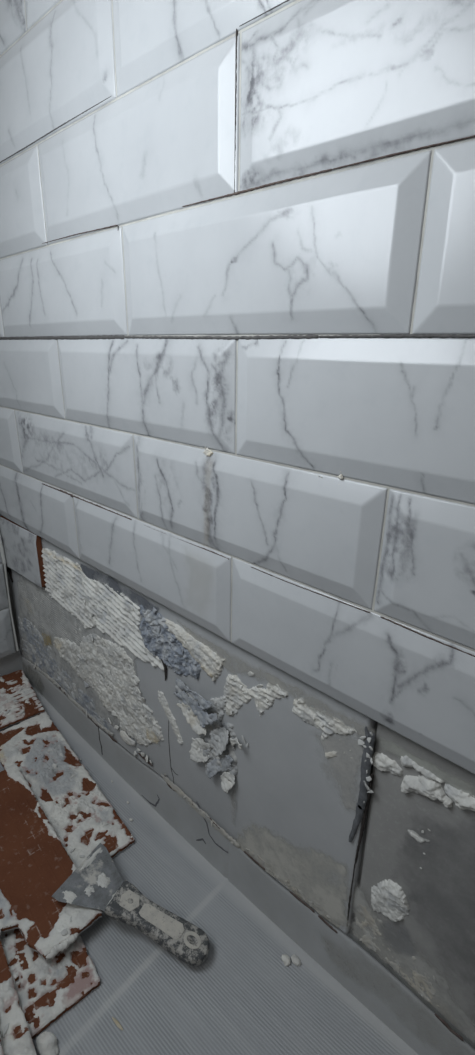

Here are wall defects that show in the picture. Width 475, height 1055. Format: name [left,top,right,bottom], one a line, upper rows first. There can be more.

spalling [312,713,374,803]